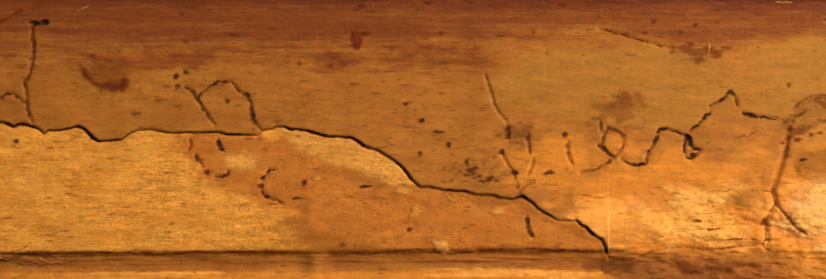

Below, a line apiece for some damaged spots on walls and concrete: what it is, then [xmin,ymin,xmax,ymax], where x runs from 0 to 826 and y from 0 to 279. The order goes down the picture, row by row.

water stain [82,68,128,91]
crack [0,11,608,254]
crack [592,90,776,171]
crack [707,177,806,248]
crack [0,242,300,267]